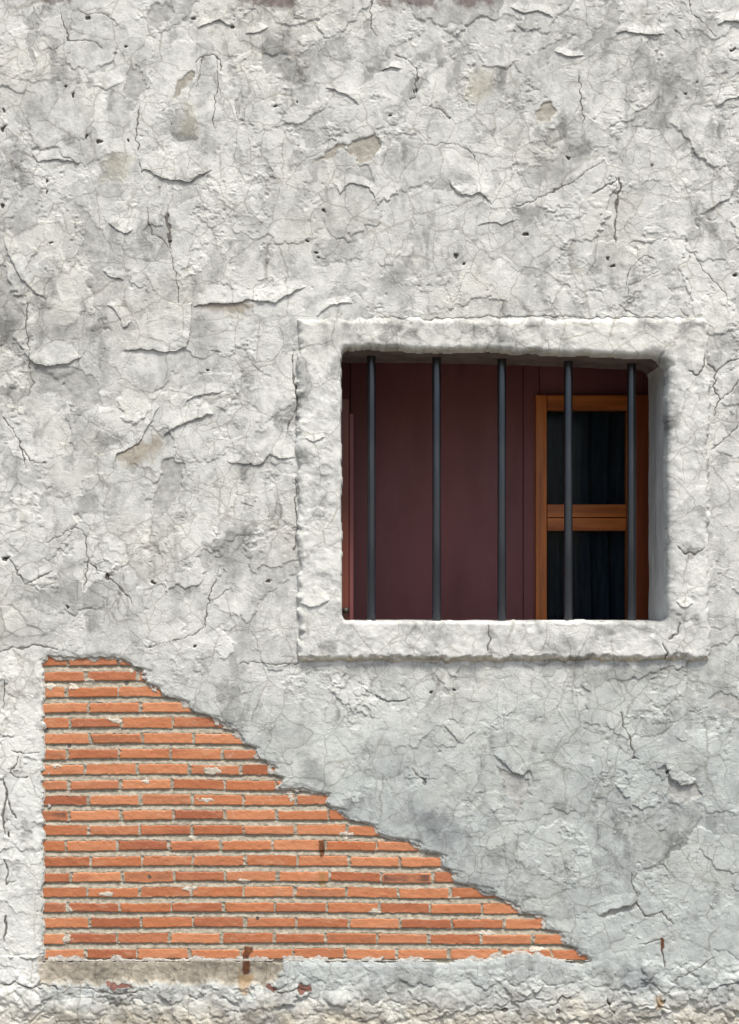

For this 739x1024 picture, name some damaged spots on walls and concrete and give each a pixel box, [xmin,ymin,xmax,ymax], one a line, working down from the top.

spalling [173,70,195,98]
spalling [535,101,557,122]
spalling [315,133,381,202]
crack [515,160,622,242]
crack [147,208,179,303]
crack [379,255,688,321]
crack [287,352,298,433]
crack [689,354,739,449]
crack [1,750,39,835]
spalling [37,655,592,961]
crack [4,981,143,999]
corrosion [243,946,253,975]